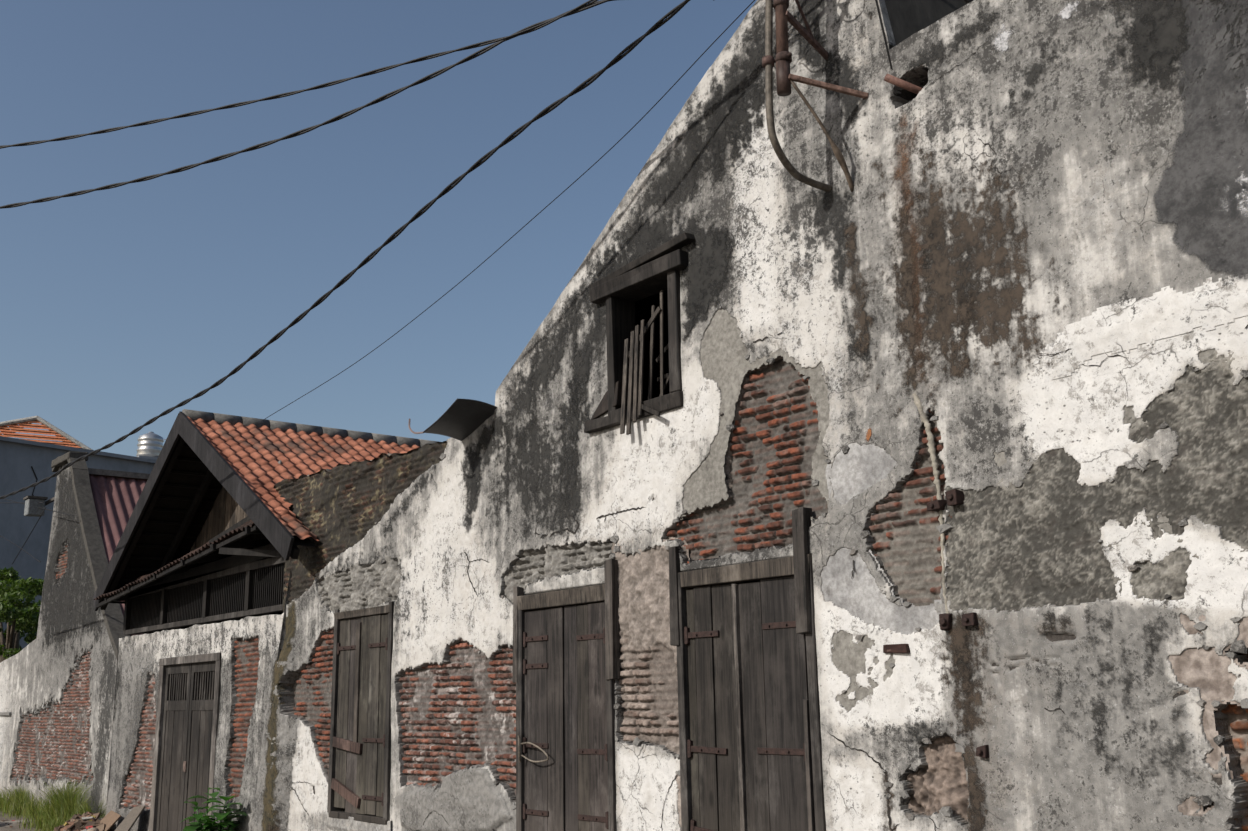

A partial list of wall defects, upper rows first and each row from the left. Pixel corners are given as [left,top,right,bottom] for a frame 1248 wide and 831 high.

water stain [1103,0,1248,280]
water stain [462,16,776,542]
spalling [273,441,447,614]
peeling [501,306,1248,785]
spalling [12,652,93,785]
water stain [39,467,120,814]
spalling [228,637,260,801]
spalling [278,629,334,774]
spalling [399,639,516,810]
crack [827,731,898,831]
spalling [899,734,970,822]
peeling [1178,796,1215,817]